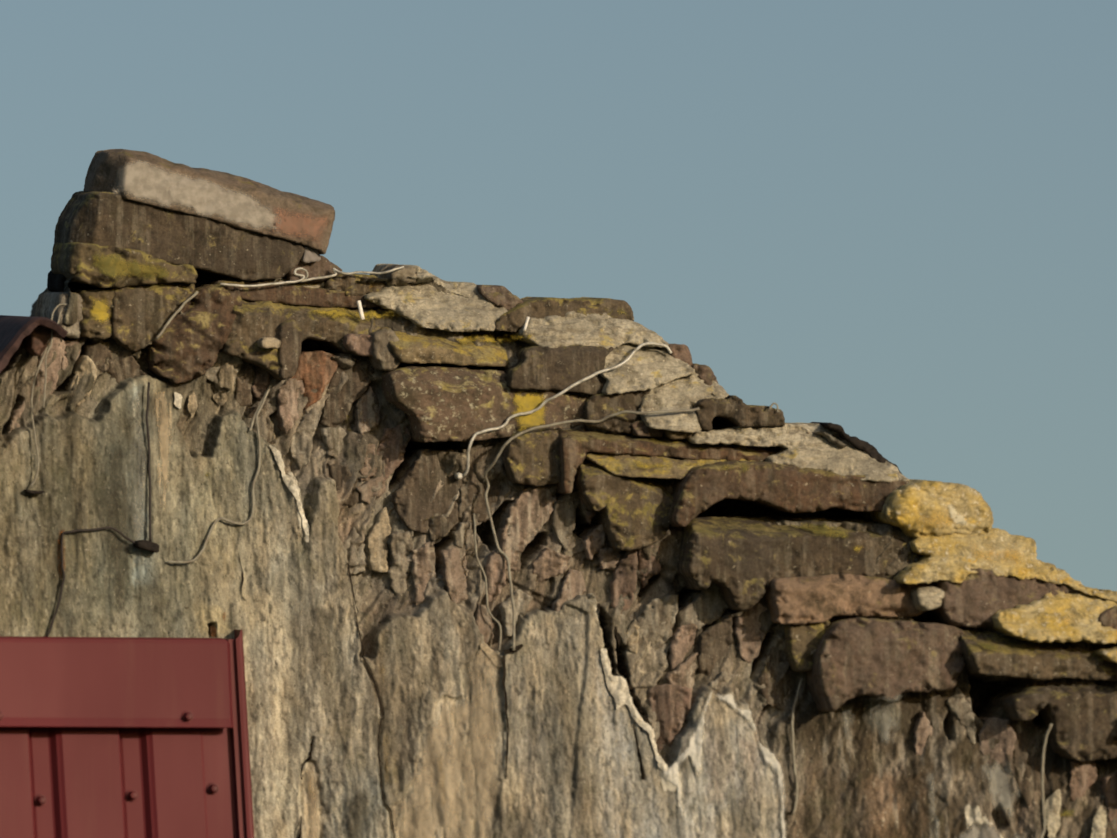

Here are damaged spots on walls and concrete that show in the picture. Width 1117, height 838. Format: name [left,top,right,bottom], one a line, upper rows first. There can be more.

spalling [174,392,198,418]
spalling [269,445,310,542]
crack [347,563,395,838]
peeling [480,643,502,667]
crack [502,644,523,779]
crack [597,603,655,780]
spalling [600,648,756,816]
spalling [759,743,785,838]
peeling [960,804,1003,838]
peeling [1045,789,1062,838]
peeling [1091,806,1107,838]